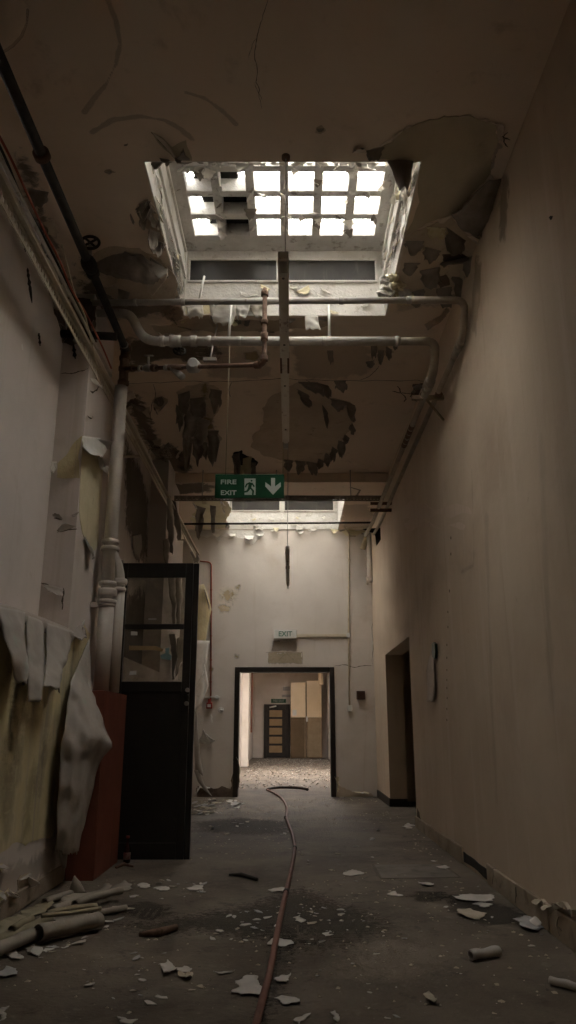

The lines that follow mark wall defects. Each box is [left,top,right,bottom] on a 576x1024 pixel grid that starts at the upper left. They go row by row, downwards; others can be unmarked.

peeling [41,114,505,346]
peeling [152,383,222,472]
peeling [232,380,356,475]
flaking render [57,436,103,550]
flaking render [0,624,90,872]